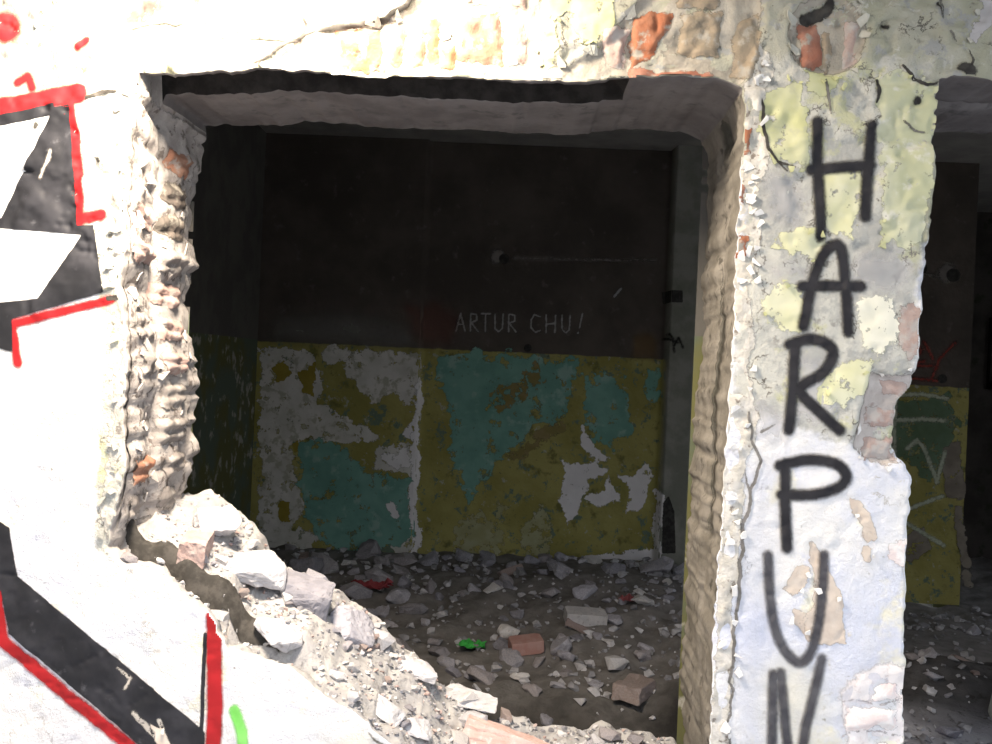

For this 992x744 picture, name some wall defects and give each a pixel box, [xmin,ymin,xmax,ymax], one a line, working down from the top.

peeling [133,28,226,73]
crack [243,0,412,65]
flaking render [97,79,198,543]
flaking render [256,0,871,744]
flaking render [817,294,974,588]
peeling [151,725,170,744]
flaking render [840,662,905,744]